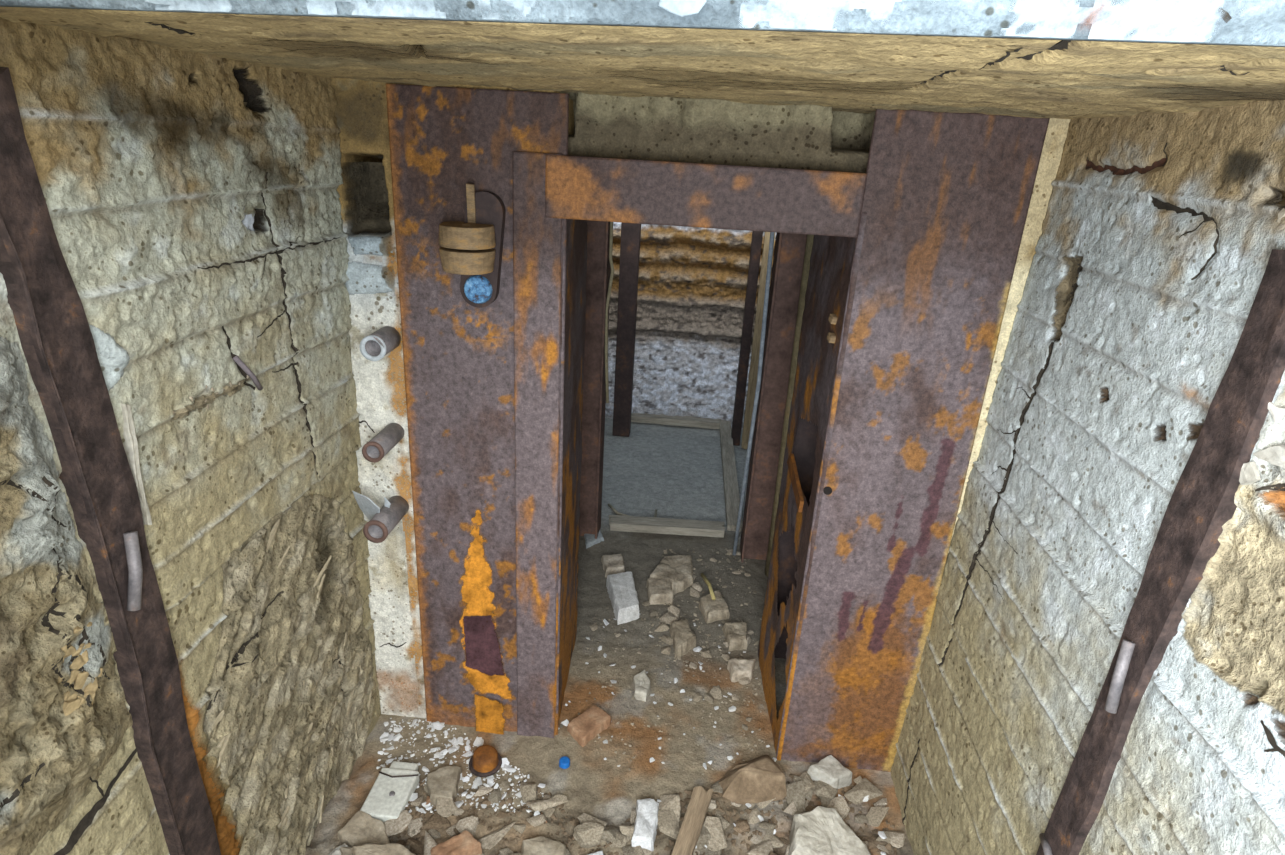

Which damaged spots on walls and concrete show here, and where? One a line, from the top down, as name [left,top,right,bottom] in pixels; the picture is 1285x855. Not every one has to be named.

crack [197,172,340,475]
rust [386,326,407,416]
rust [378,457,422,709]
rust [459,510,512,734]
crack [938,263,1082,666]
crack [1151,196,1219,280]
spalling [1182,392,1285,747]
spalling [1265,188,1285,230]